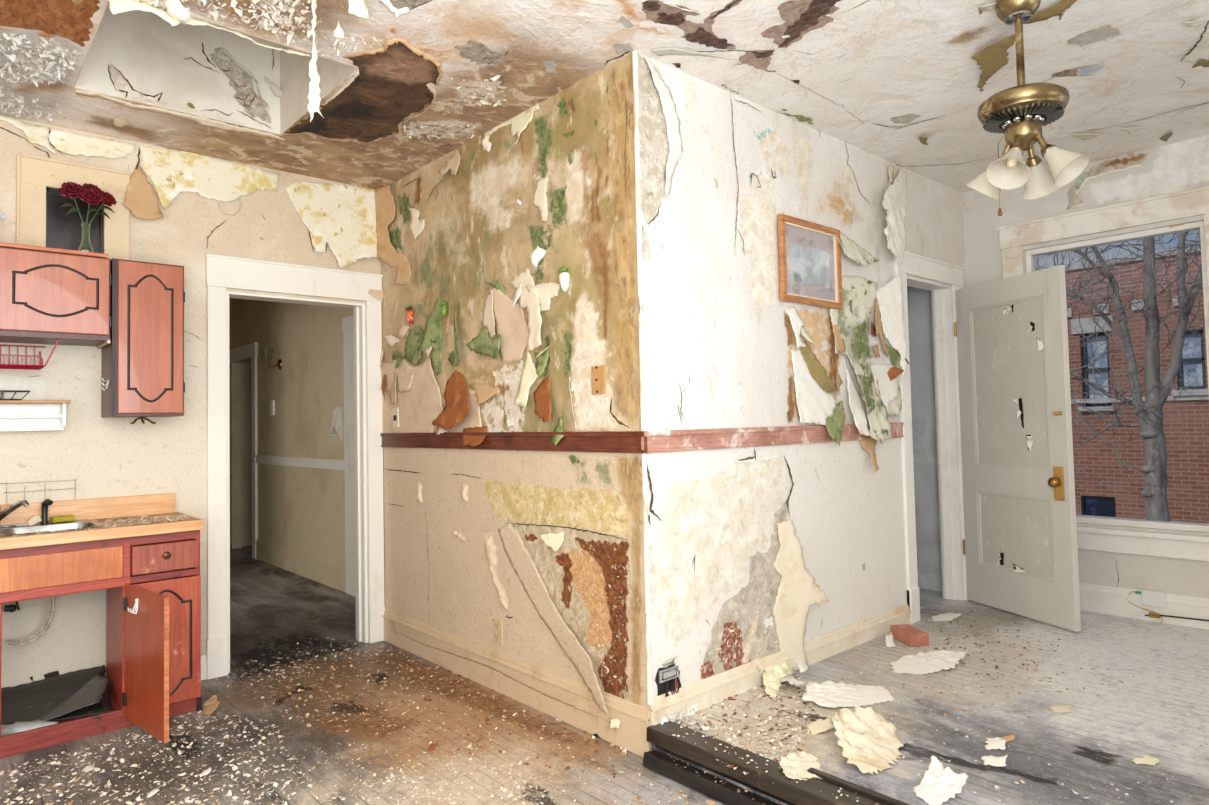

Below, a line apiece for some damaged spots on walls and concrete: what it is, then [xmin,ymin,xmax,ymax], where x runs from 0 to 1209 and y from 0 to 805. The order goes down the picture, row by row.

peeling [0,0,100,121]
leakage [75,114,166,147]
leakage [118,97,248,128]
spalling [133,0,523,239]
peeling [564,145,594,225]
peeling [613,43,670,263]
spalling [619,0,843,72]
crack [1080,21,1209,132]
peeling [739,129,871,436]
peeling [436,361,526,435]
peeling [569,287,620,432]
peeling [483,453,789,706]